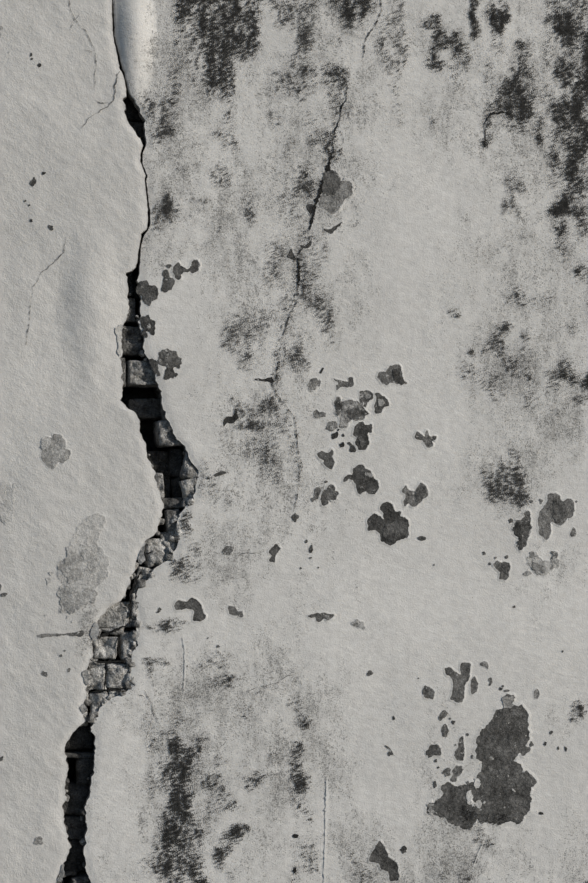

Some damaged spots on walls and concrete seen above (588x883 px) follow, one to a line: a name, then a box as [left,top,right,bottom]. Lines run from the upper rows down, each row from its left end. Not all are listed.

crack [69,1,145,156]
water stain [140,0,410,190]
crack [362,0,382,60]
water stain [419,0,588,262]
spalling [112,0,226,479]
water stain [222,160,338,493]
crack [270,83,351,509]
crack [56,271,199,883]
peeling [305,362,430,548]
peeling [482,491,578,583]
water stain [139,690,251,883]
flaking render [423,660,553,833]